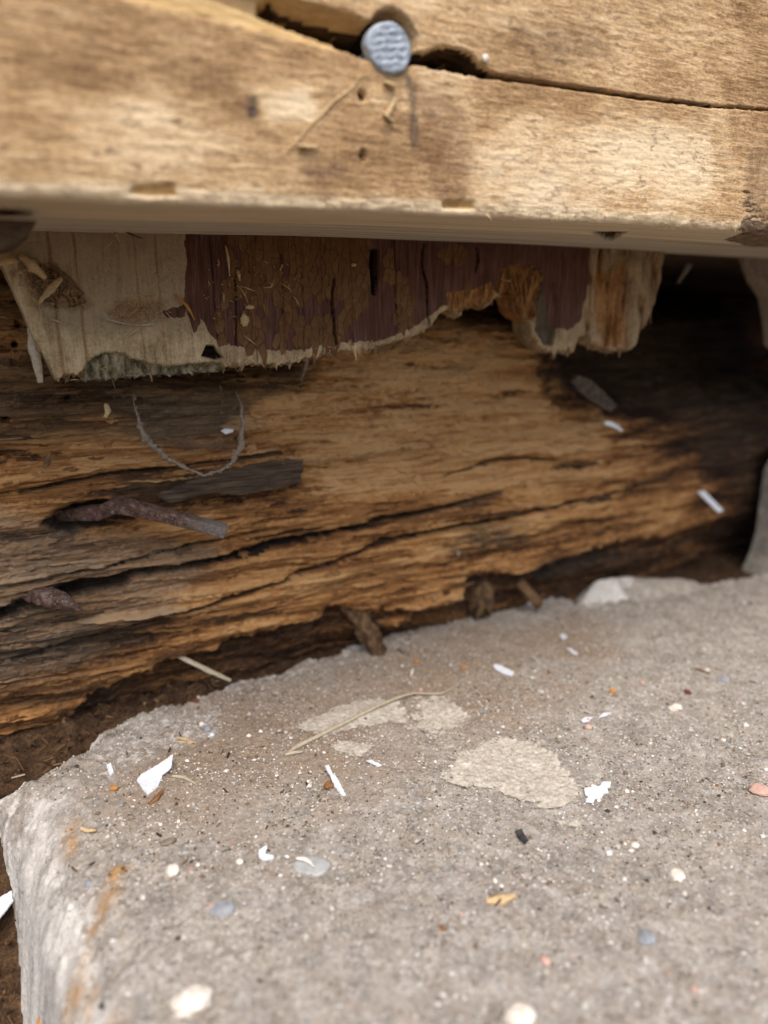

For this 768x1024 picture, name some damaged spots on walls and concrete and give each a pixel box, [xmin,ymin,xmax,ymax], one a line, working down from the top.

crack [257,3,375,57]
crack [406,47,496,80]
peeling [214,235,373,368]
spalling [446,263,544,320]
crack [85,461,216,478]
crack [64,511,434,574]